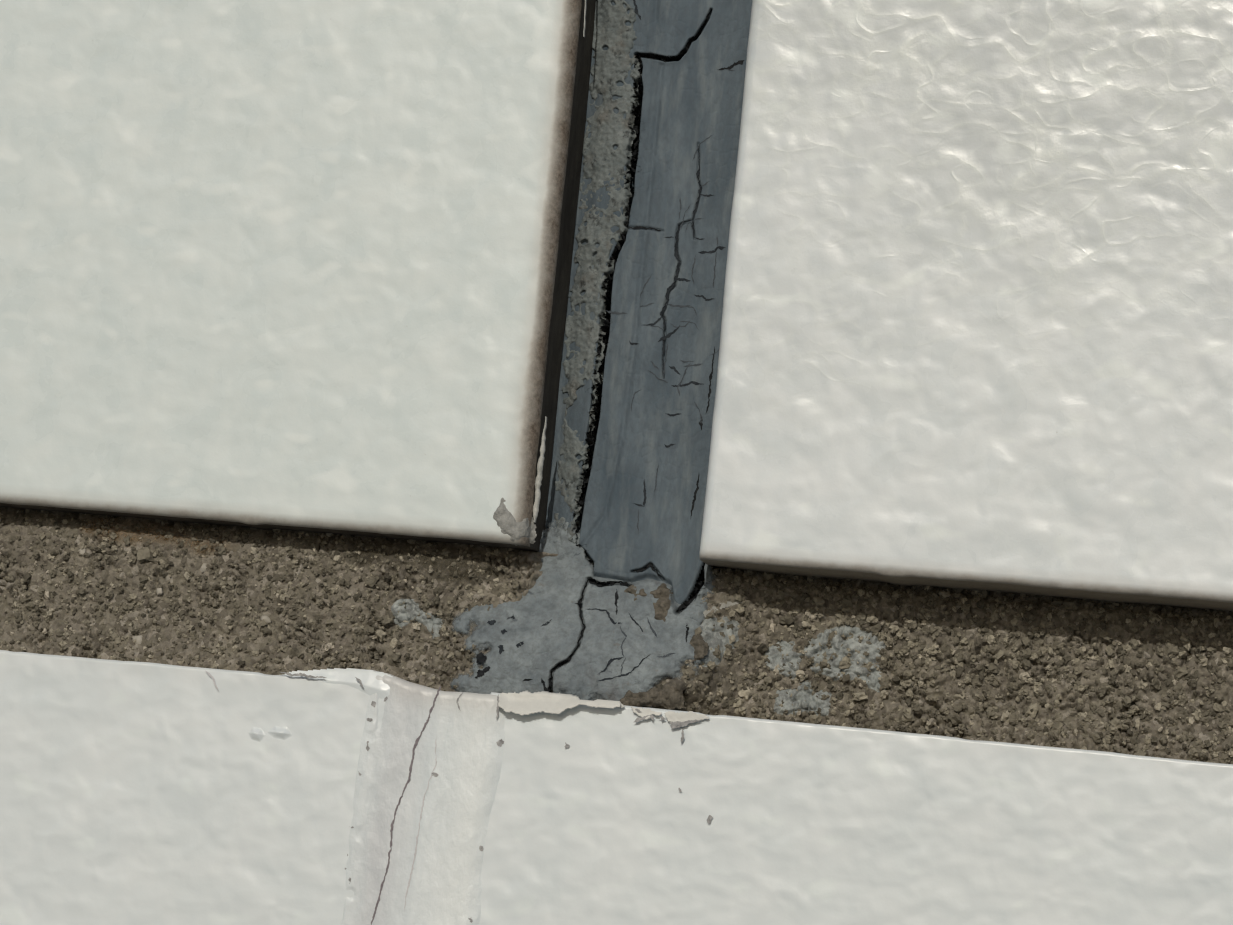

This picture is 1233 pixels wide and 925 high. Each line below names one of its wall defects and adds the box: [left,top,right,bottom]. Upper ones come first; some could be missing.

crack [719,60,744,71]
crack [523,9,725,693]
peeling [280,668,395,722]
peeling [496,690,710,743]
crack [371,686,441,924]